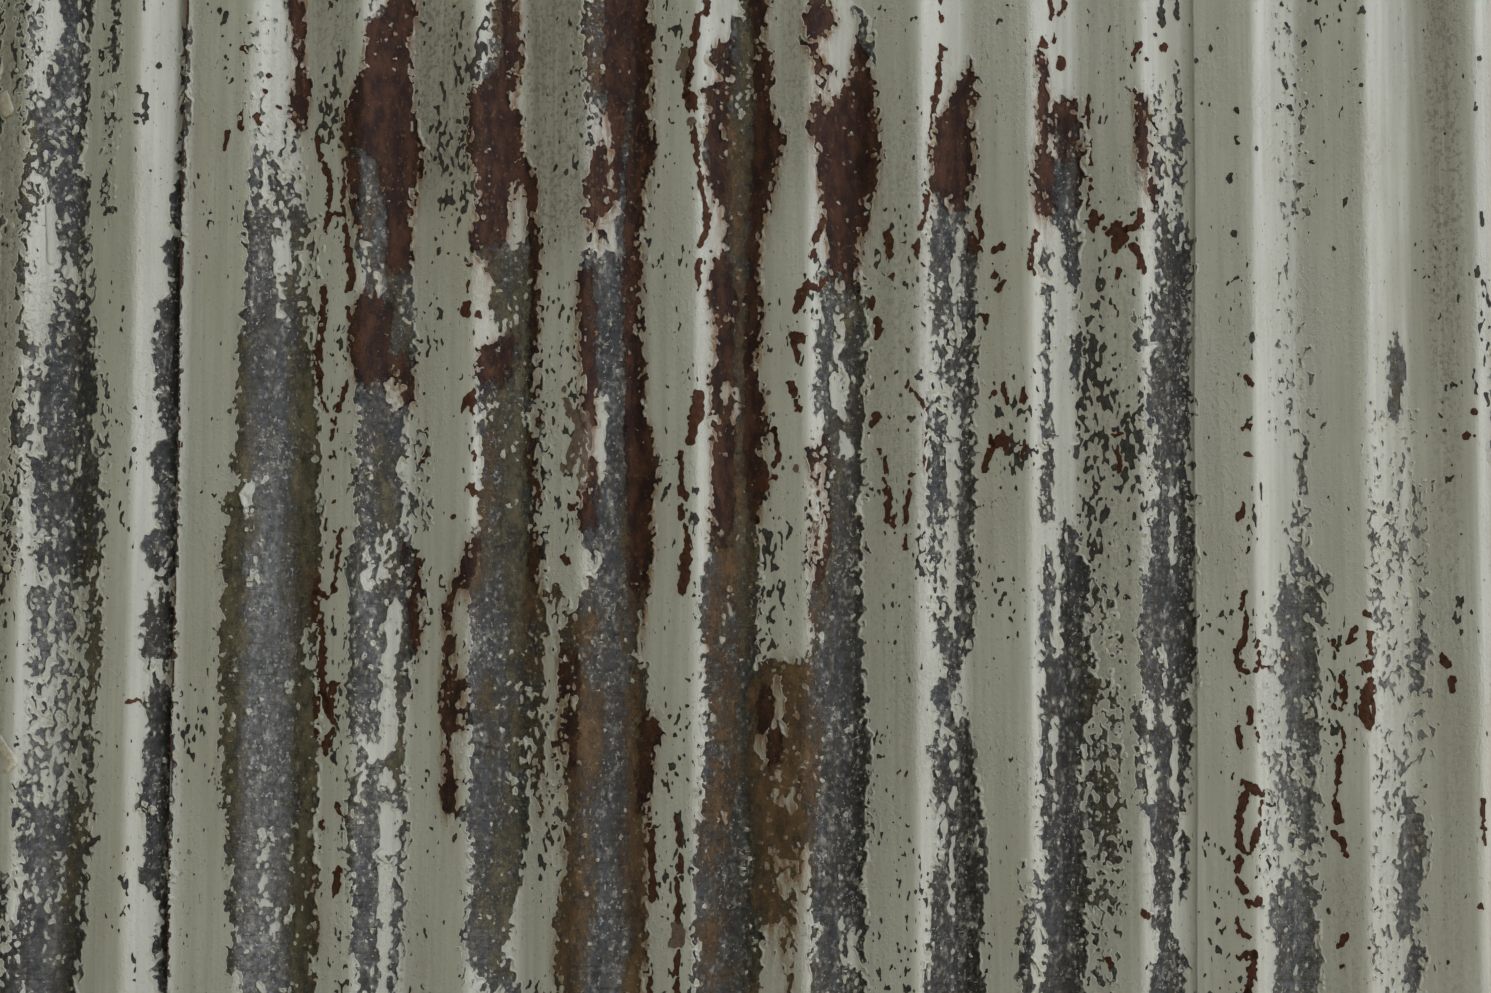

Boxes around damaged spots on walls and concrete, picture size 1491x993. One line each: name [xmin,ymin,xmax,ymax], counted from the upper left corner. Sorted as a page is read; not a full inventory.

rust [675,46,698,126]
rust [927,43,948,163]
rust [460,263,482,319]
peeling [1226,230,1255,311]
rust [677,389,705,596]
peeling [1229,482,1263,568]
peeling [1242,0,1491,993]
rust [1327,609,1376,731]
peeling [1208,886,1248,993]
rust [1244,895,1263,909]
rust [1336,932,1349,969]